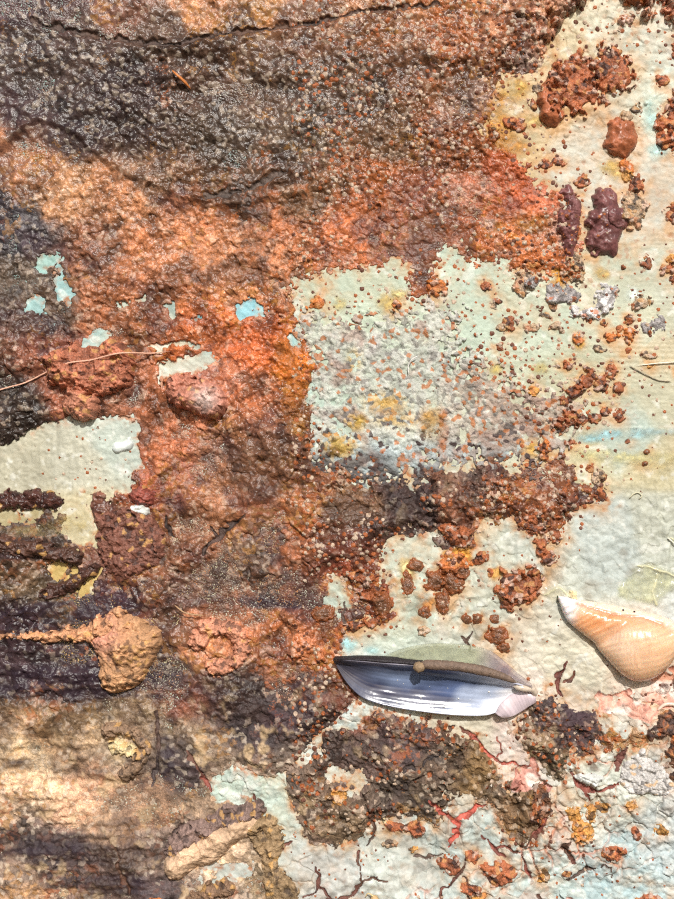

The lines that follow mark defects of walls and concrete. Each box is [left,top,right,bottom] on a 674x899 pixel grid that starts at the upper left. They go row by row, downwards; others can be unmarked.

crack [30,0,440,46]
rust [617,0,674,27]
rust [602,117,638,177]
rust [0,0,629,446]
rust [0,283,591,899]
crack [402,725,531,774]
rust [516,696,653,782]
crack [570,747,628,801]
crack [282,811,388,899]
crack [413,800,548,899]
crack [560,841,613,881]